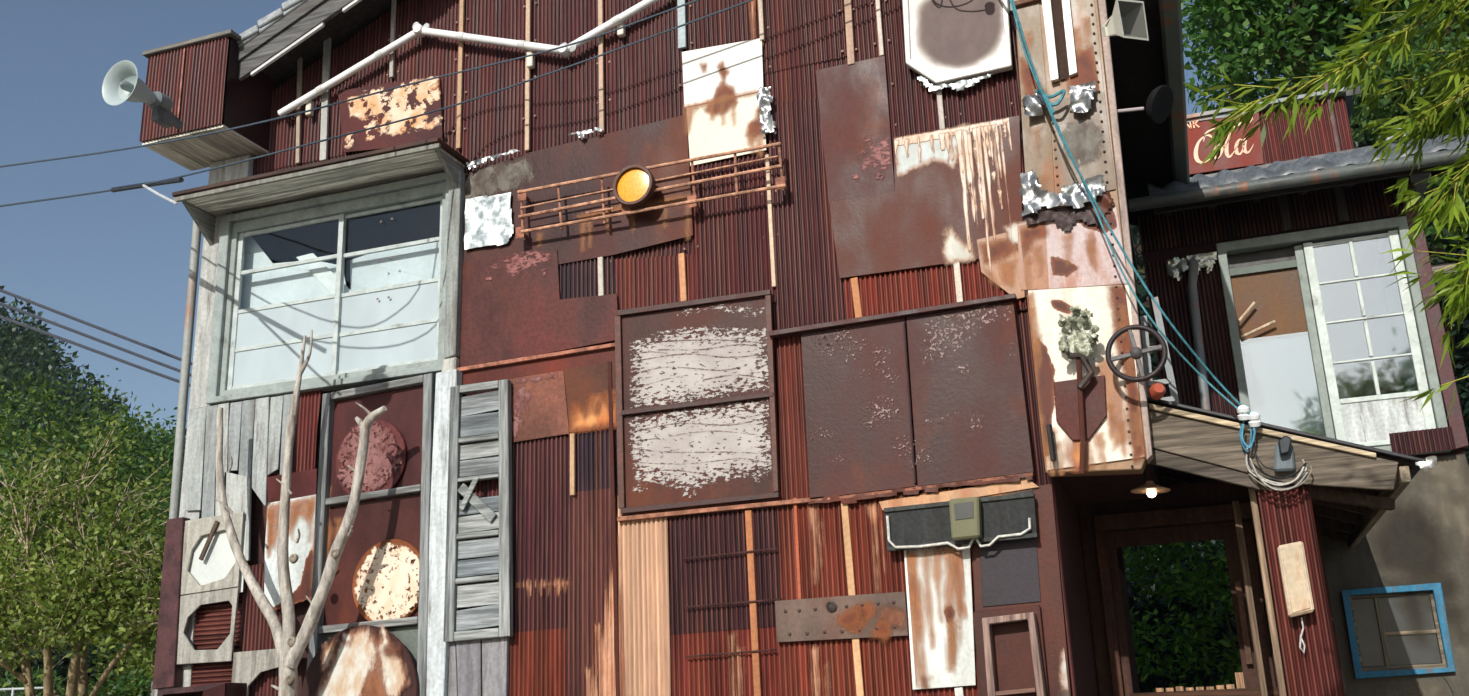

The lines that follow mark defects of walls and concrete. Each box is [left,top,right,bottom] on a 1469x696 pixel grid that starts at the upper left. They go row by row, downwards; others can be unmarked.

peeling [344,76,443,149]
corrosion [686,62,763,154]
leakage [894,121,1012,273]
corrosion [981,208,1117,285]
peeling [628,304,772,498]
corrosion [808,285,1147,688]
peeling [321,632,354,672]
peeling [378,625,409,696]